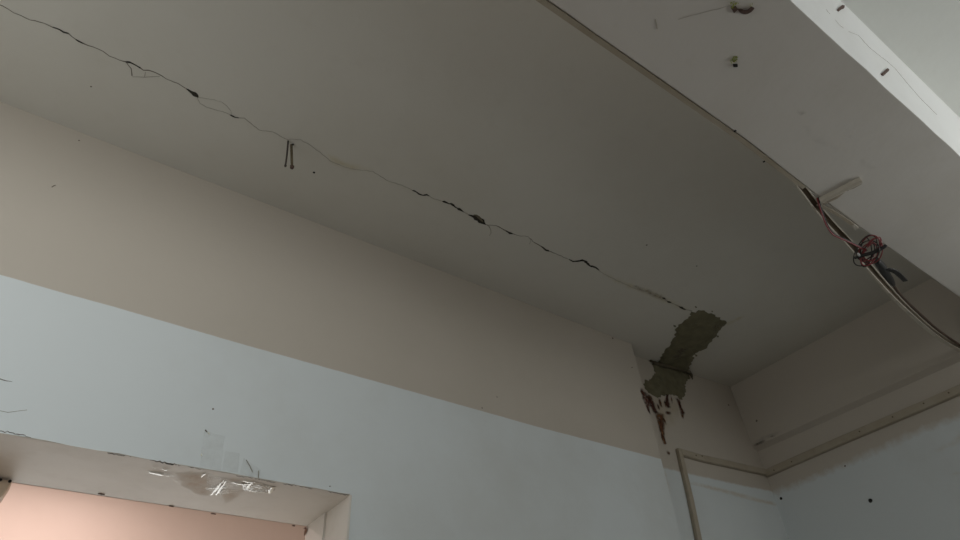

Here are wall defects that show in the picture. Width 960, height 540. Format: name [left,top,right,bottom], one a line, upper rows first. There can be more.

crack [0,5,692,311]
corrosion [640,389,686,454]